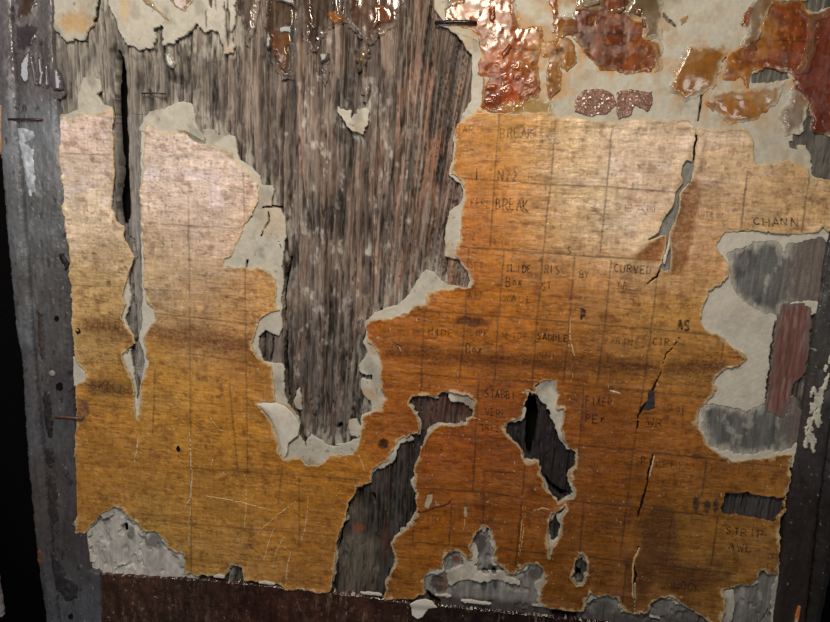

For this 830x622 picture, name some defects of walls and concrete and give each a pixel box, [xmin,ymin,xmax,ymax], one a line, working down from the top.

peeling [53,0,830,468]
crack [647,95,702,284]
crack [636,337,679,429]
peeling [331,392,474,595]
peeling [504,380,576,554]
crack [637,454,655,516]
peeling [87,507,201,579]
peeling [404,526,552,615]
peeling [571,554,588,585]
crack [632,546,640,605]
peeling [576,583,709,622]
peeling [722,562,780,622]